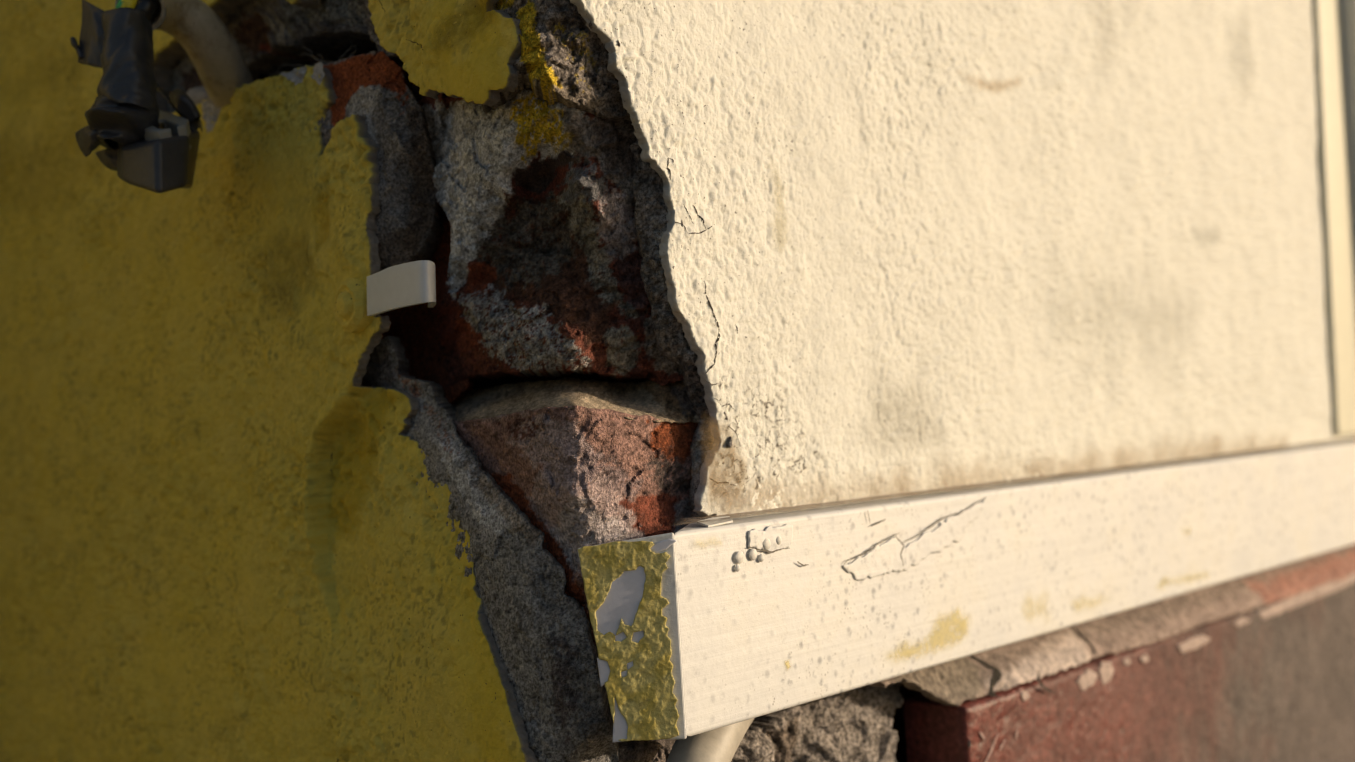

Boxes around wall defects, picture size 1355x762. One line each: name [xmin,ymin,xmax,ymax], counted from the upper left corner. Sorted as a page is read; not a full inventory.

spalling [166,55,221,133]
spalling [224,0,444,271]
spalling [481,0,631,121]
spalling [630,142,733,527]
spalling [360,336,677,762]
peeling [842,497,989,581]
spalling [1234,572,1355,629]
spalling [1076,653,1149,691]
spalling [1177,634,1211,654]